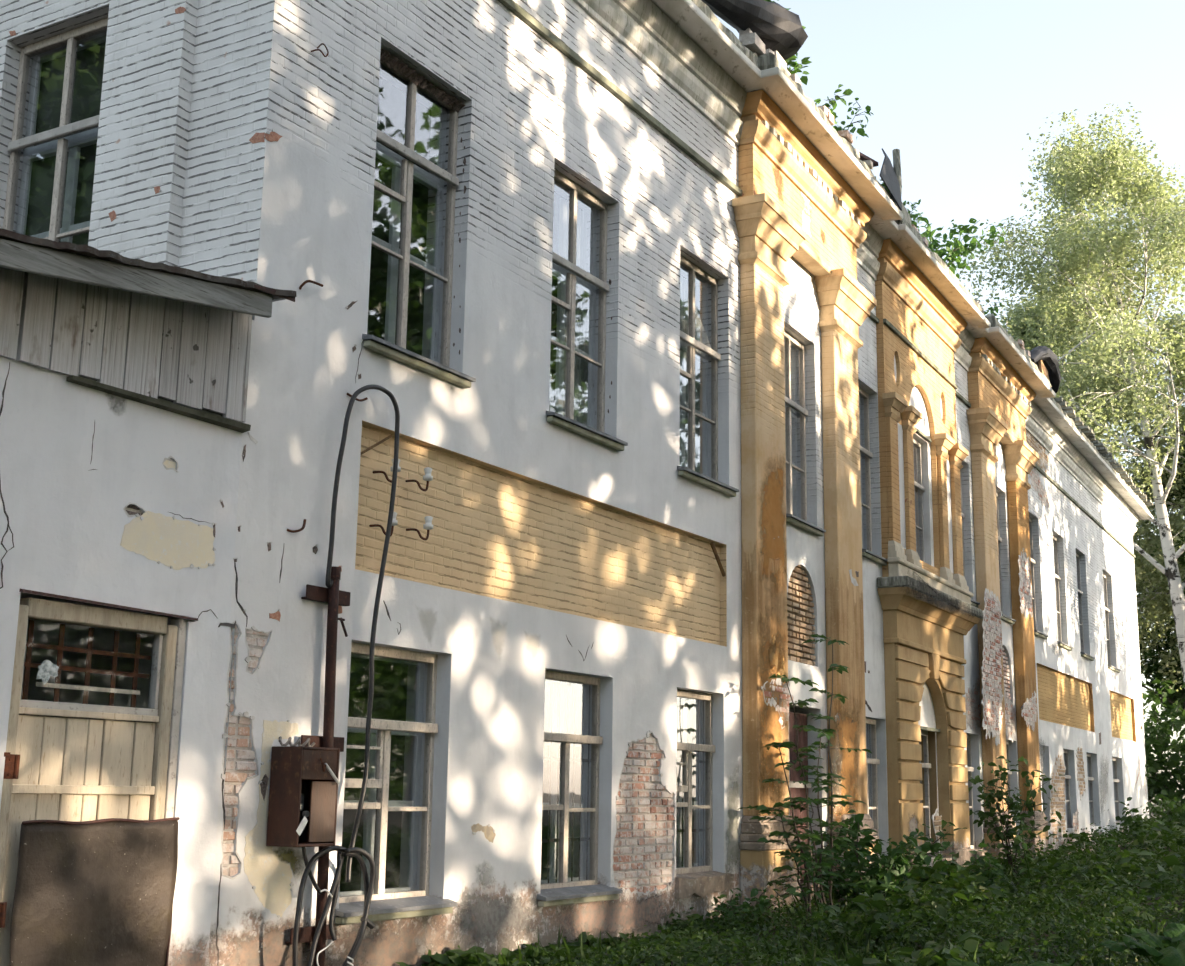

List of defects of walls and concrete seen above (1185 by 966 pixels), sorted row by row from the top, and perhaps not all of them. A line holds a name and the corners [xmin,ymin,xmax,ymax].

crack [0,480,14,589]
water stain [760,461,786,591]
crack [188,562,248,628]
water stain [760,615,787,795]
flaking render [965,588,1037,746]
crack [220,768,228,828]
flaking render [221,609,299,918]
flaking render [612,730,676,895]
flaking render [1049,746,1086,846]
crack [215,868,223,966]
water stain [169,897,534,966]
water stain [559,894,671,935]